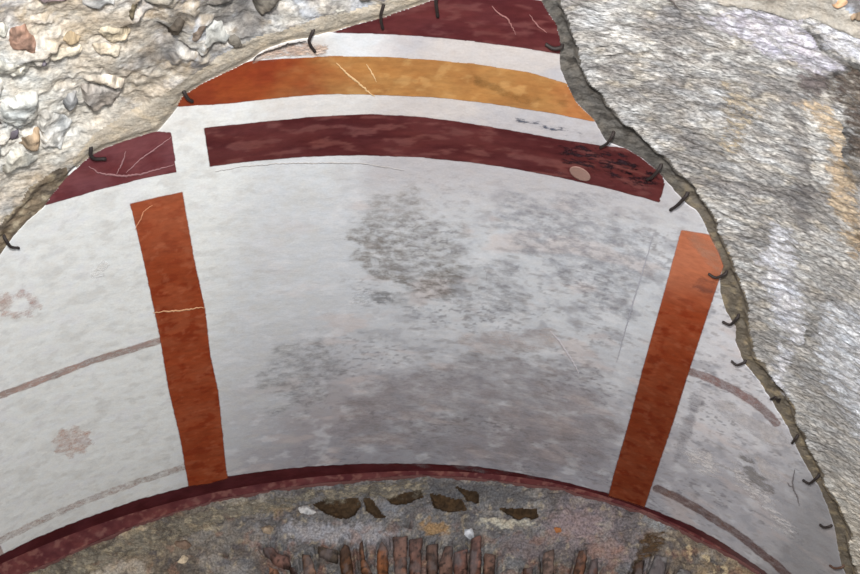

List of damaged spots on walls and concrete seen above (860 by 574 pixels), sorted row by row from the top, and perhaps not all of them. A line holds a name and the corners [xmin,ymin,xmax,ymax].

crack [492,6,547,35]
crack [336,63,376,97]
crack [89,137,174,177]
peeling [562,145,657,186]
crack [155,306,203,314]
spalling [313,497,386,519]
spalling [387,486,479,513]
spalling [500,507,539,520]